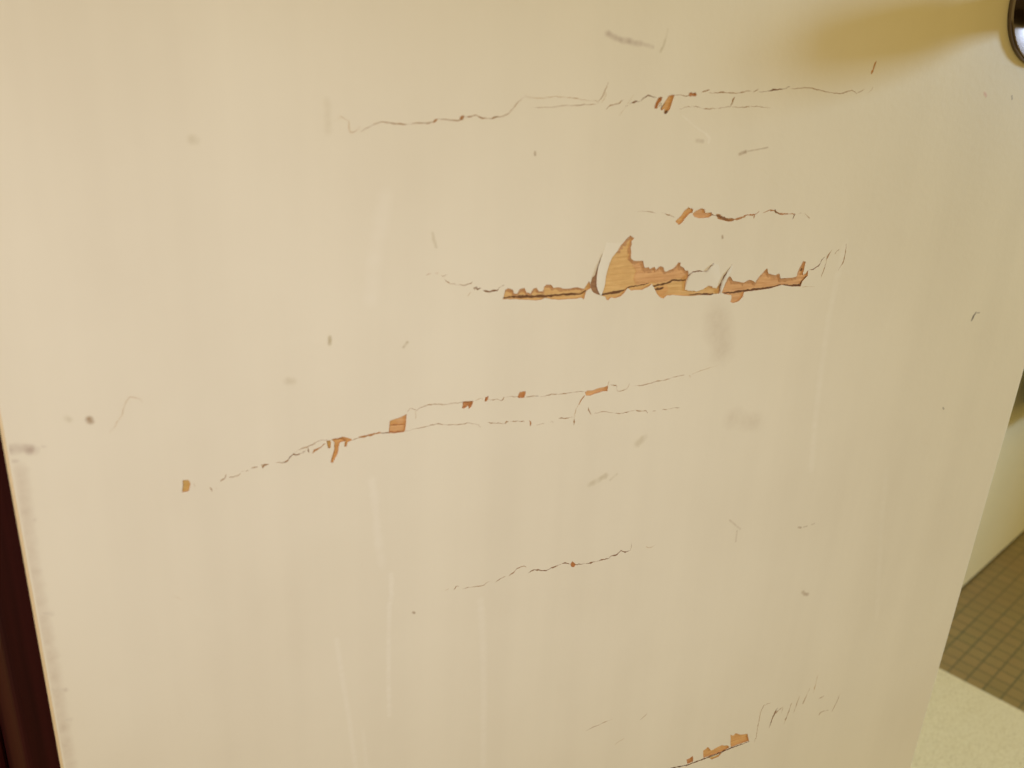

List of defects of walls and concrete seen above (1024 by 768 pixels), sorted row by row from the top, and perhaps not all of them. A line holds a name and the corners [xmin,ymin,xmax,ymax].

crack [338,85,864,133]
peeling [427,236,846,303]
crack [447,543,653,590]
peeling [673,733,749,768]